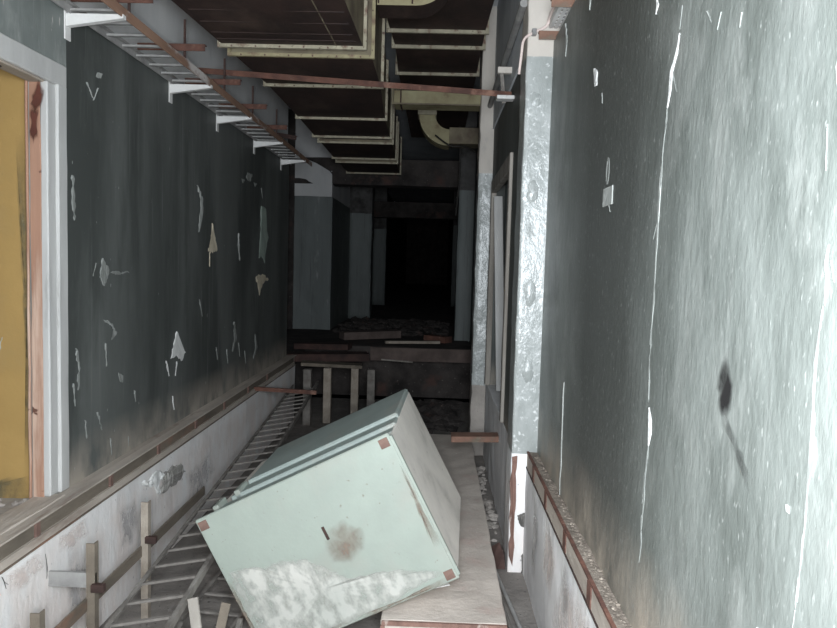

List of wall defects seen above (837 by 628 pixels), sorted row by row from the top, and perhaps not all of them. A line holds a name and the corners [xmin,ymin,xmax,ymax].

rust [30,82,43,140]
peeling [242,172,269,263]
peeling [208,223,217,267]
peeling [93,258,129,286]
peeling [256,274,269,295]
peeling [166,331,186,376]
peeling [216,322,258,362]
peeling [72,348,80,406]
leakage [719,366,731,412]